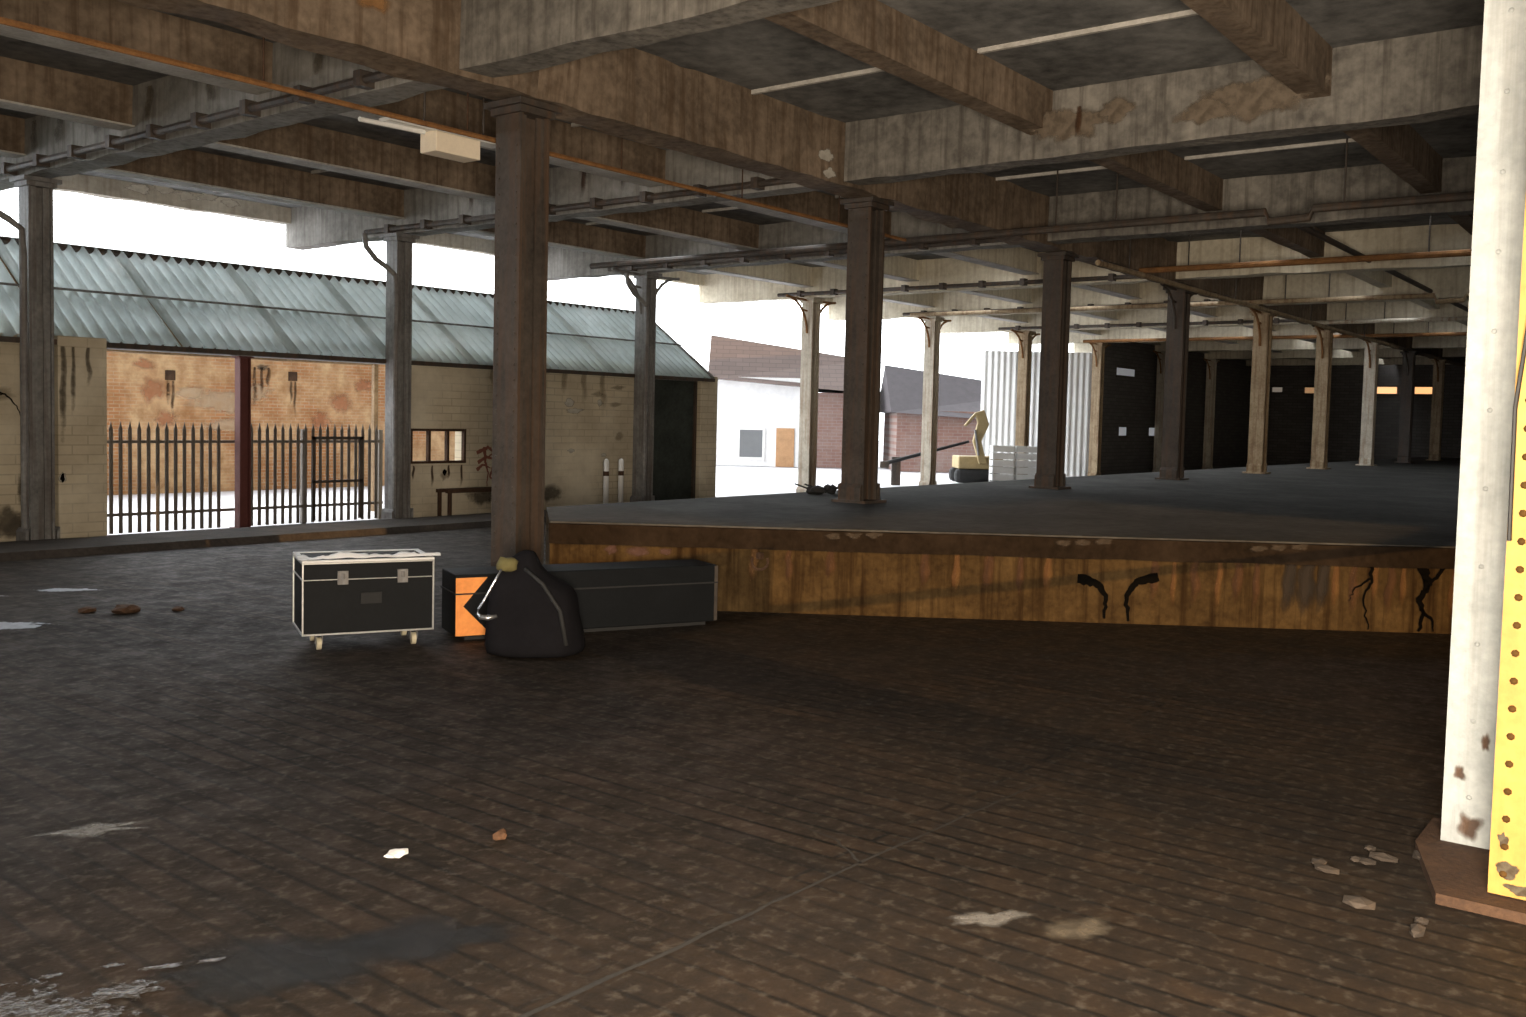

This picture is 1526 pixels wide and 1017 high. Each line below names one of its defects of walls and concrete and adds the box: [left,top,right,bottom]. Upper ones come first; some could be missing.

crack [1077,573,1159,621]
crack [1348,567,1374,630]
crack [1416,568,1445,632]